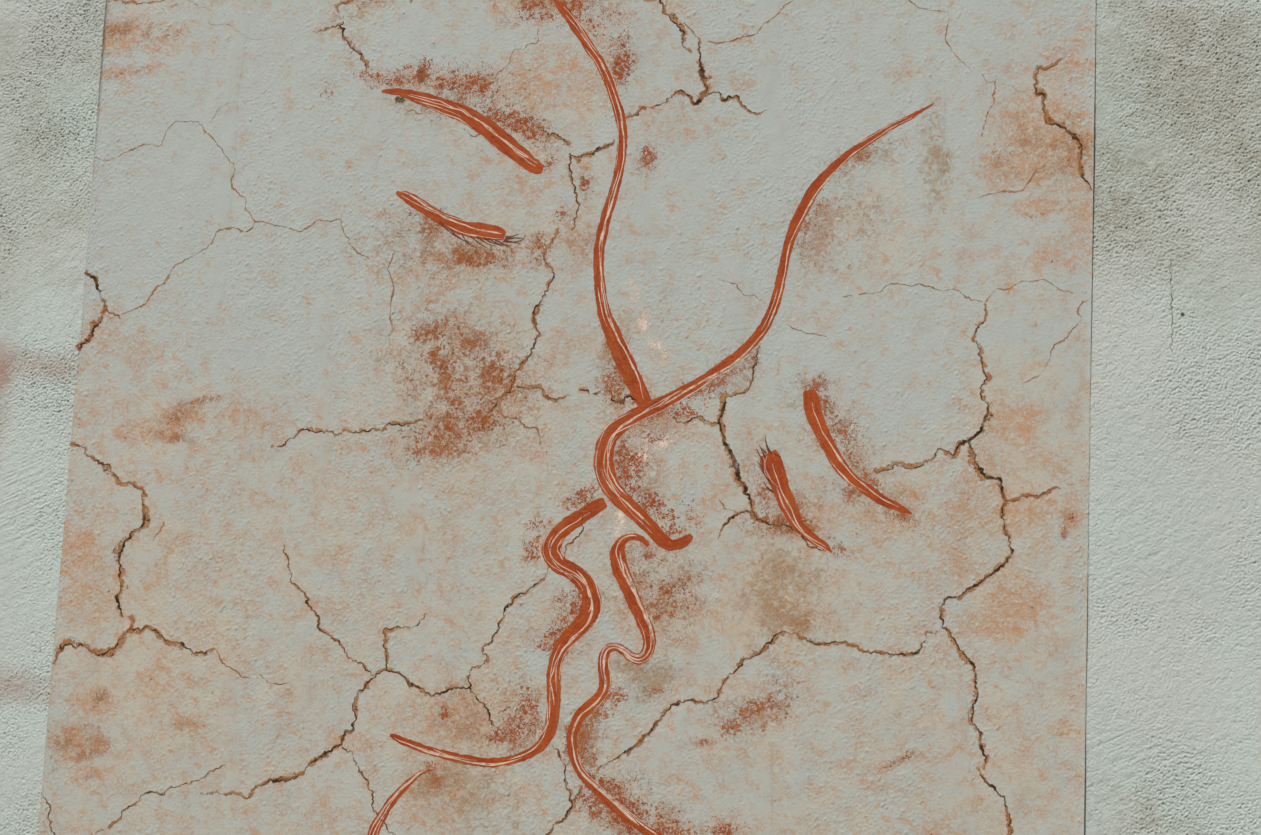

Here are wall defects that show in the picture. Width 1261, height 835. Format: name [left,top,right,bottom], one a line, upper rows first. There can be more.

crack [108,0,164,8]
crack [75,103,396,352]
crack [319,0,370,74]
crack [488,0,792,445]
crack [909,0,1092,191]
crack [978,166,1045,198]
crack [271,419,424,448]
crack [52,442,295,685]
crack [91,485,601,835]
crack [545,279,1092,835]